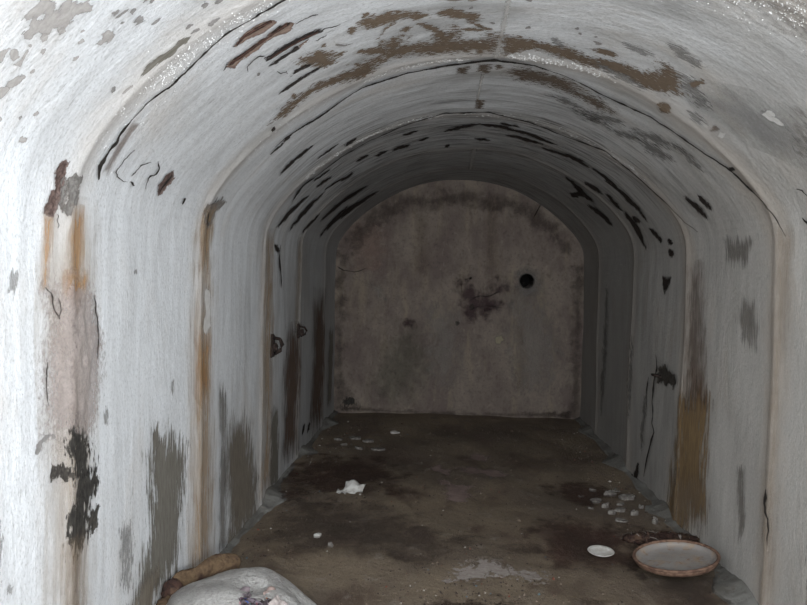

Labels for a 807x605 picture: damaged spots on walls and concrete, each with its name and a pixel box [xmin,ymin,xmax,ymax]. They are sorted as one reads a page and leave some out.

peeling [0,0,93,99]
flaking render [43,159,83,228]
rust [74,214,82,277]
crack [98,0,286,186]
peeling [223,6,705,132]
leakage [457,269,540,320]
crack [275,59,785,235]
spalling [444,122,674,258]
leakage [50,420,101,563]
leakage [119,421,188,605]
rust [195,332,209,563]
rust [666,371,710,531]